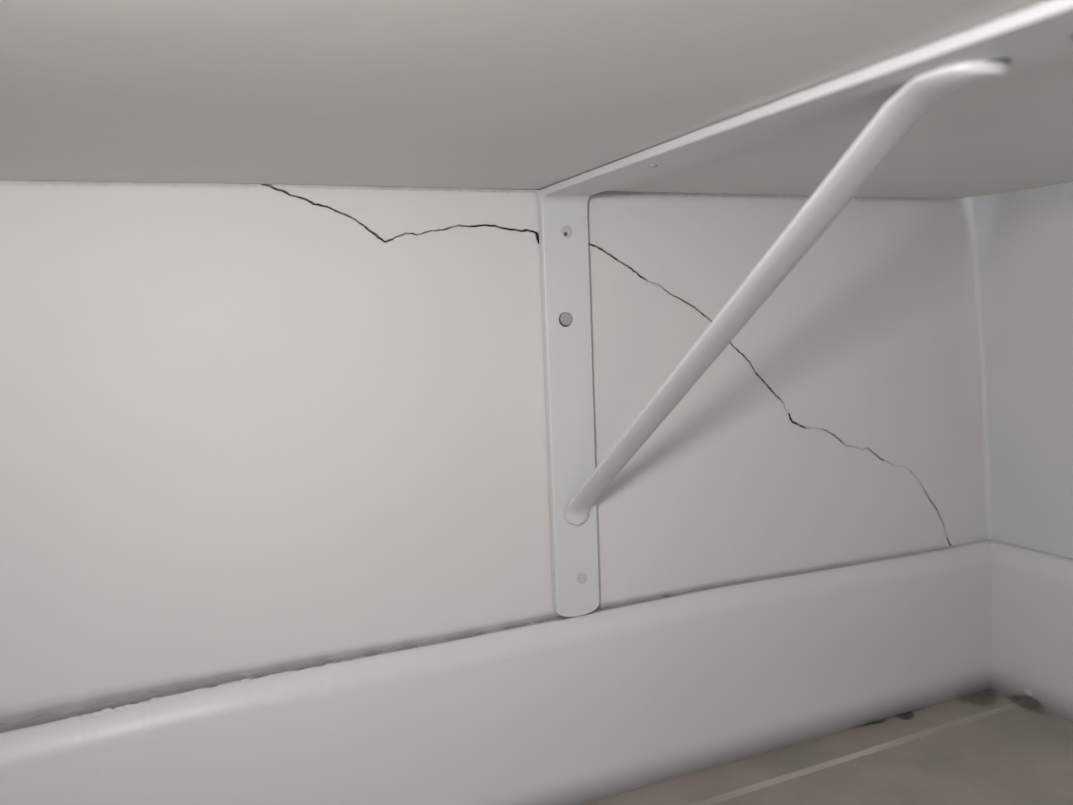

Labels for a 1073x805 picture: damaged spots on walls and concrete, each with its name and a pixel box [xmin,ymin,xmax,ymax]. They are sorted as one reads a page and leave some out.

crack [261,184,539,244]
crack [589,244,712,322]
crack [730,342,844,444]